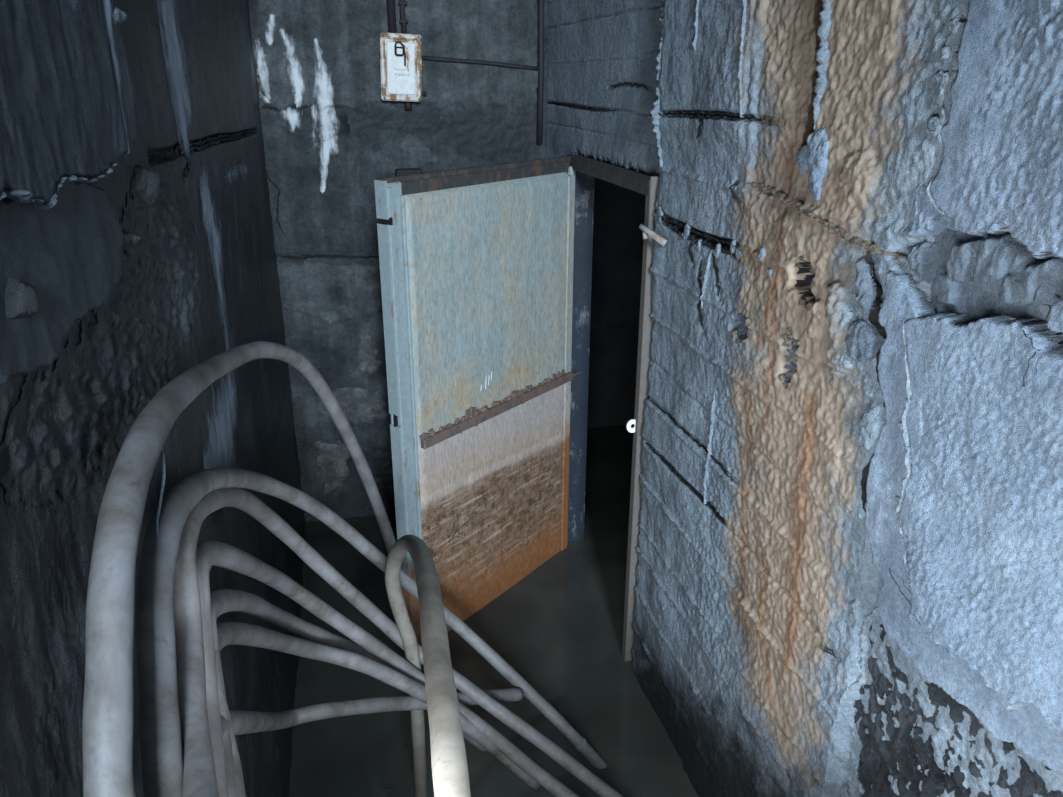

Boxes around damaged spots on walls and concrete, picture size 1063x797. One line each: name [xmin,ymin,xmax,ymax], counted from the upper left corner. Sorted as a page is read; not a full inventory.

leakage [256,0,534,193]
leakage [796,128,829,202]
rust [727,0,904,772]
crack [865,250,887,407]
crack [1023,285,1063,387]
crack [860,455,874,512]
crack [888,568,920,624]